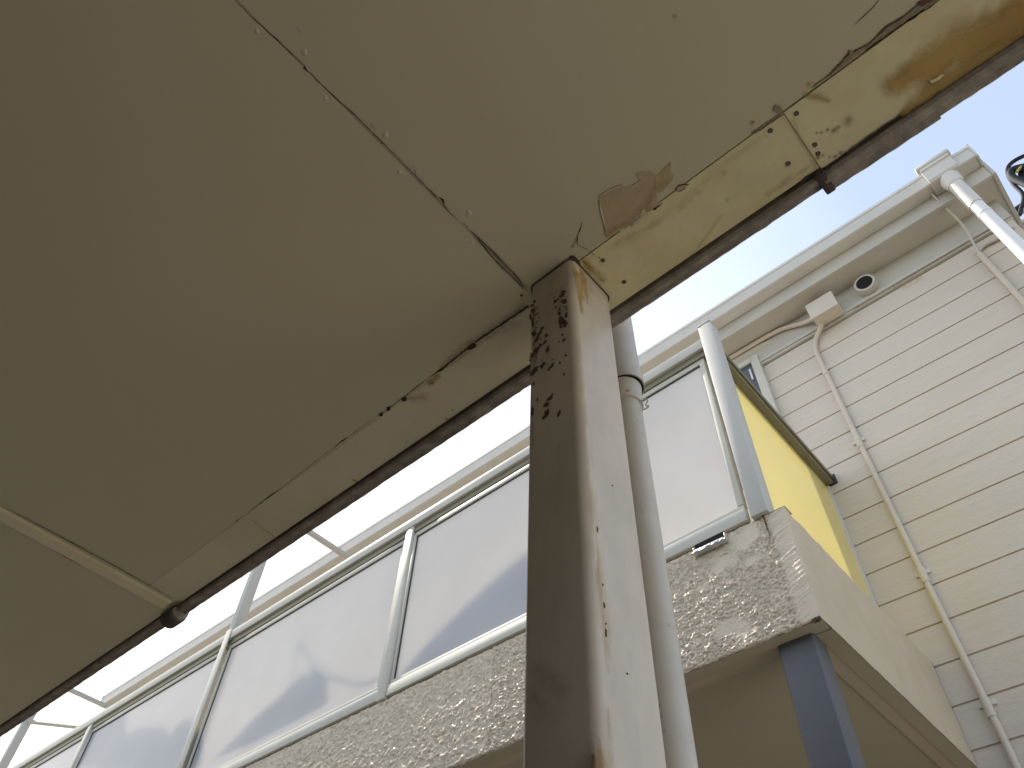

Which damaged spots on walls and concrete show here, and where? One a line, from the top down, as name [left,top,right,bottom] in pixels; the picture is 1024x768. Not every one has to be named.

peeling [599,163,689,238]